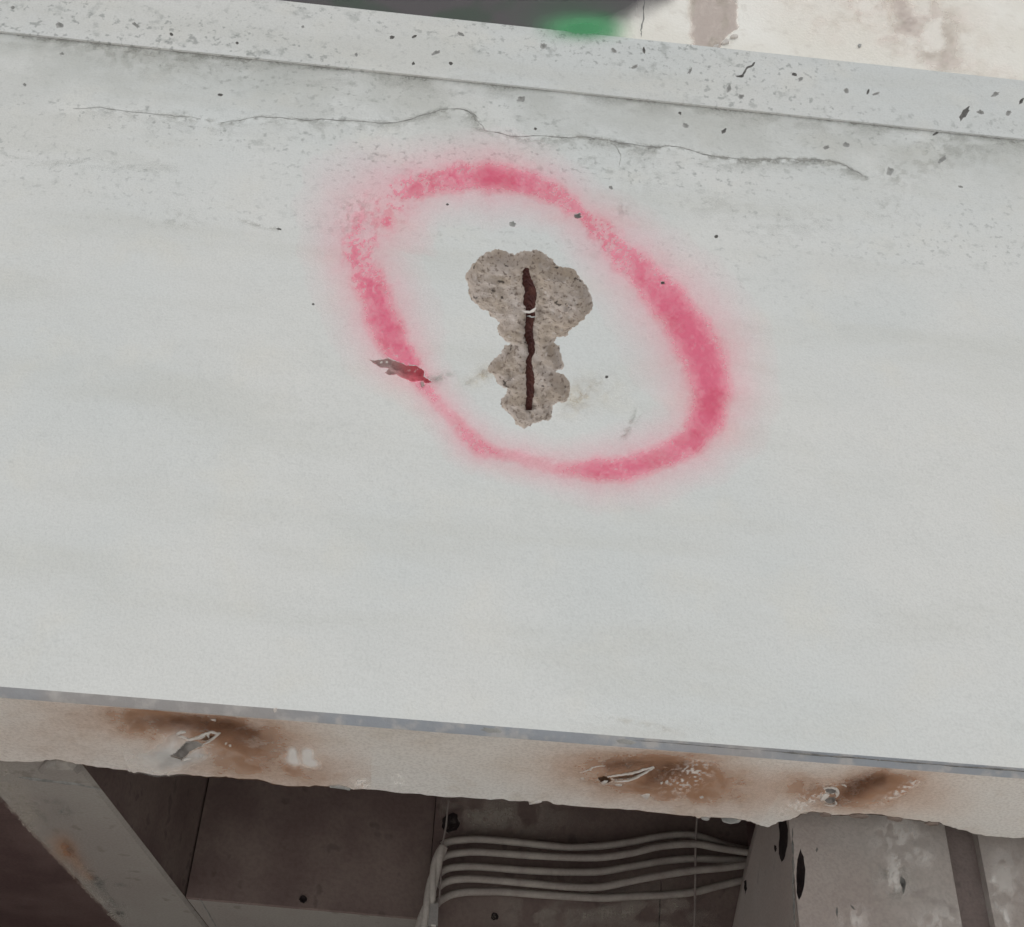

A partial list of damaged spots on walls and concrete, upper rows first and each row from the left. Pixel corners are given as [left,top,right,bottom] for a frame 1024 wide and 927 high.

crack [76,107,868,180]
spalling [465,249,593,429]
corrosion [94,706,344,786]
corrosion [557,750,755,808]
corrosion [774,768,927,811]